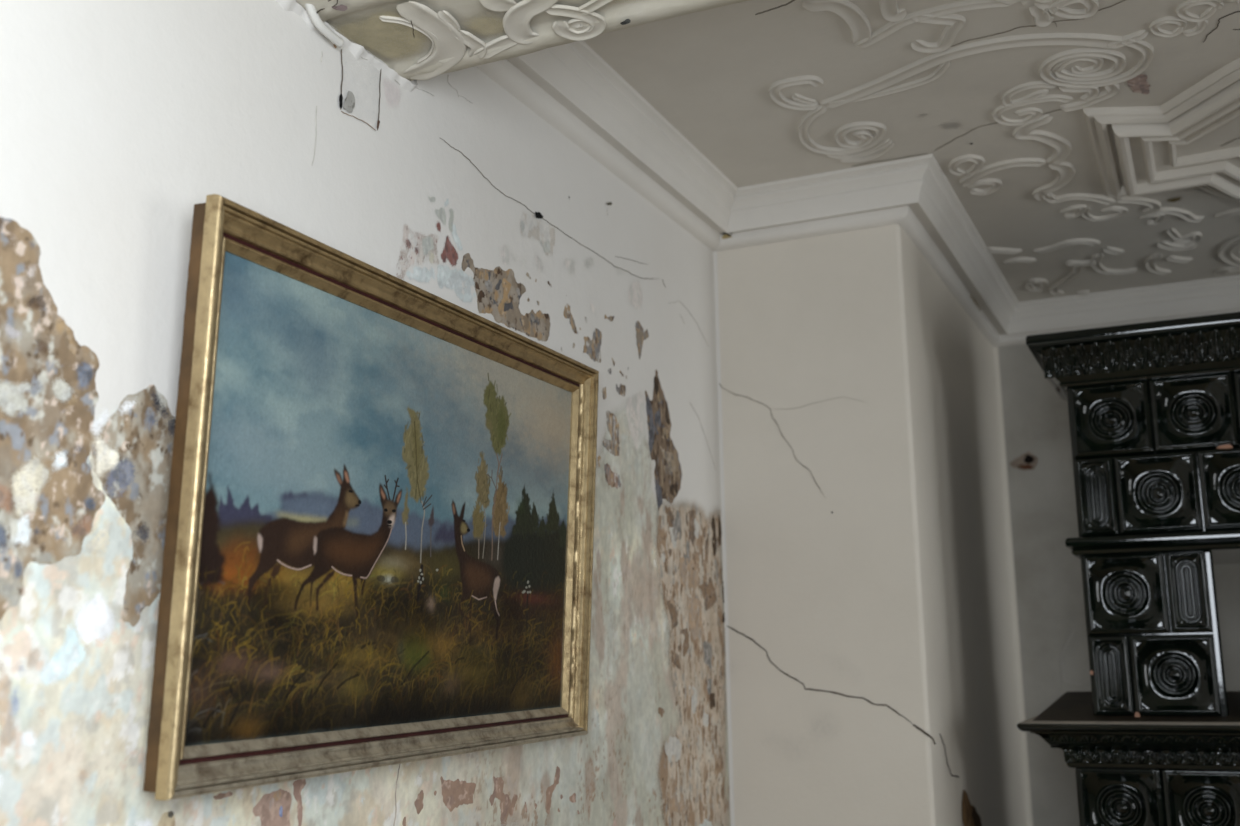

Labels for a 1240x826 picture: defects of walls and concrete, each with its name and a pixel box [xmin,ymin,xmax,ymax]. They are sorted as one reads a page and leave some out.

crack [755,0,795,15]
crack [951,0,1125,47]
crack [1203,11,1240,43]
crack [852,123,995,167]
crack [440,138,709,346]
peeling [396,195,649,489]
peeling [0,217,176,750]
spalling [645,370,728,826]
crack [727,626,959,778]
peeling [253,779,306,826]
peeling [402,776,476,826]
peeling [489,766,579,826]